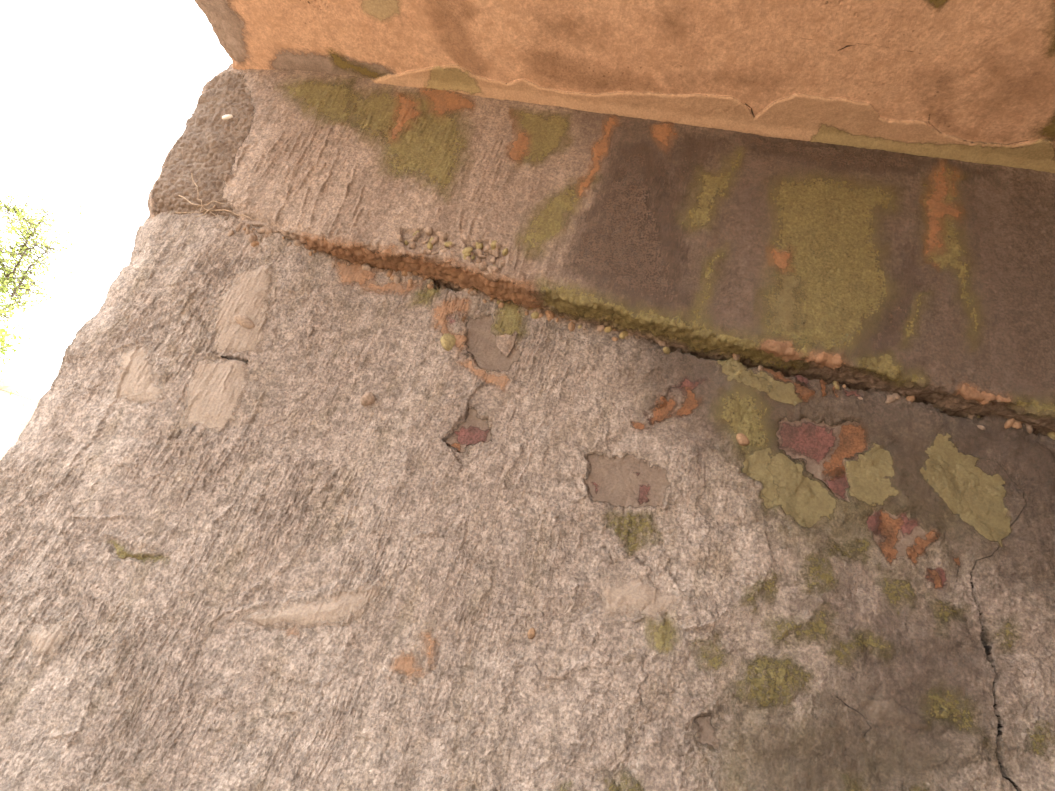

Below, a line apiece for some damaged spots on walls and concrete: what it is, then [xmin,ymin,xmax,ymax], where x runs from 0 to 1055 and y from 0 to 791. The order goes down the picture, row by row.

corrosion [578,115,618,196]
peeling [371,65,1055,173]
water stain [566,116,1055,403]
corrosion [925,161,964,269]
crack [956,458,1027,588]
crack [980,614,1018,791]